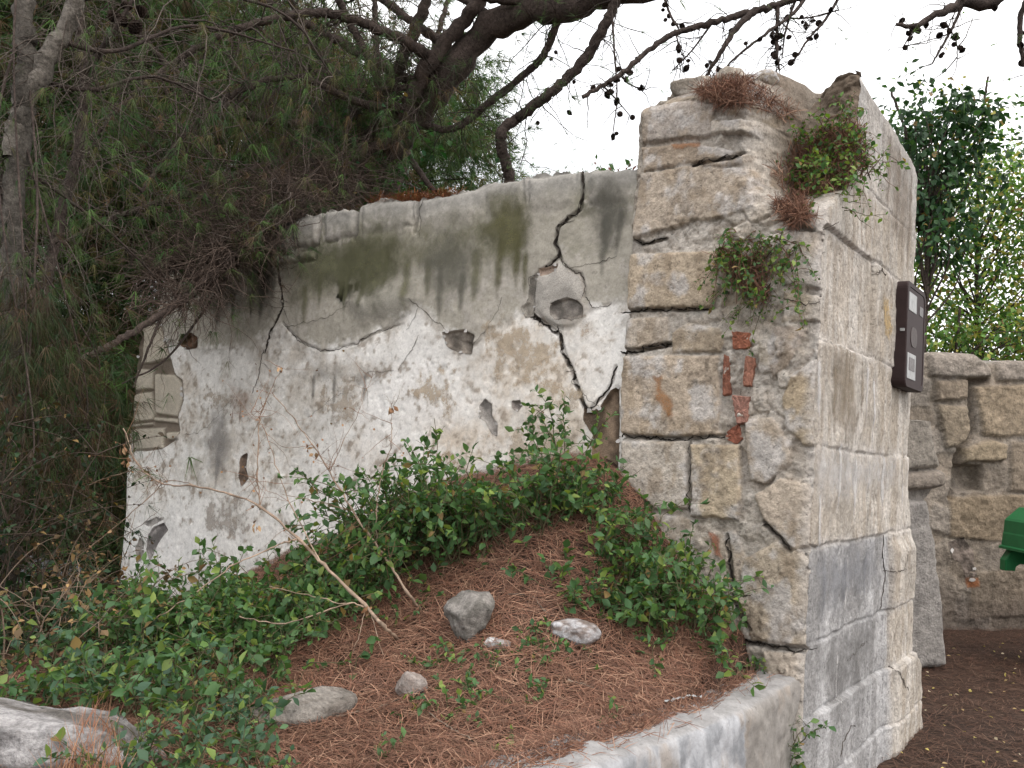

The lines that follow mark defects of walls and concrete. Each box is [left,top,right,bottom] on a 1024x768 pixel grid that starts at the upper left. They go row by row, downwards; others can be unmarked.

leakage [594,185,622,259]
leakage [426,243,479,304]
leakage [514,246,527,285]
crack [527,171,709,415]
flaking render [131,322,198,451]
crack [186,260,443,435]
flaking render [442,263,620,468]
peeling [206,453,250,539]
flaking render [135,517,168,563]